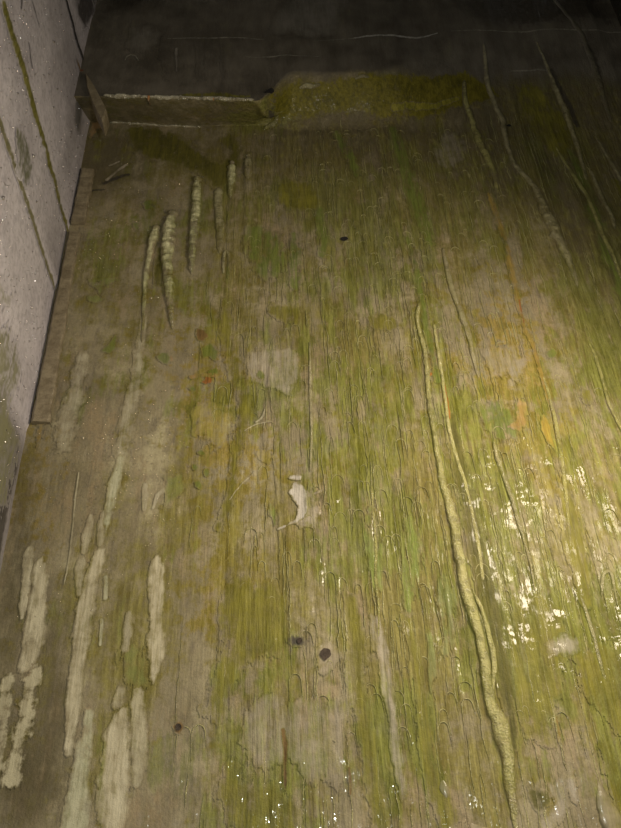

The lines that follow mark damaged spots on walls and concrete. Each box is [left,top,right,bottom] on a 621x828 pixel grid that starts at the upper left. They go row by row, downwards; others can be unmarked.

crack [66,0,84,59]
crack [167,28,621,58]
leakage [153,247,163,286]
leakage [51,351,92,455]
leakage [59,315,168,828]
leakage [0,545,50,790]